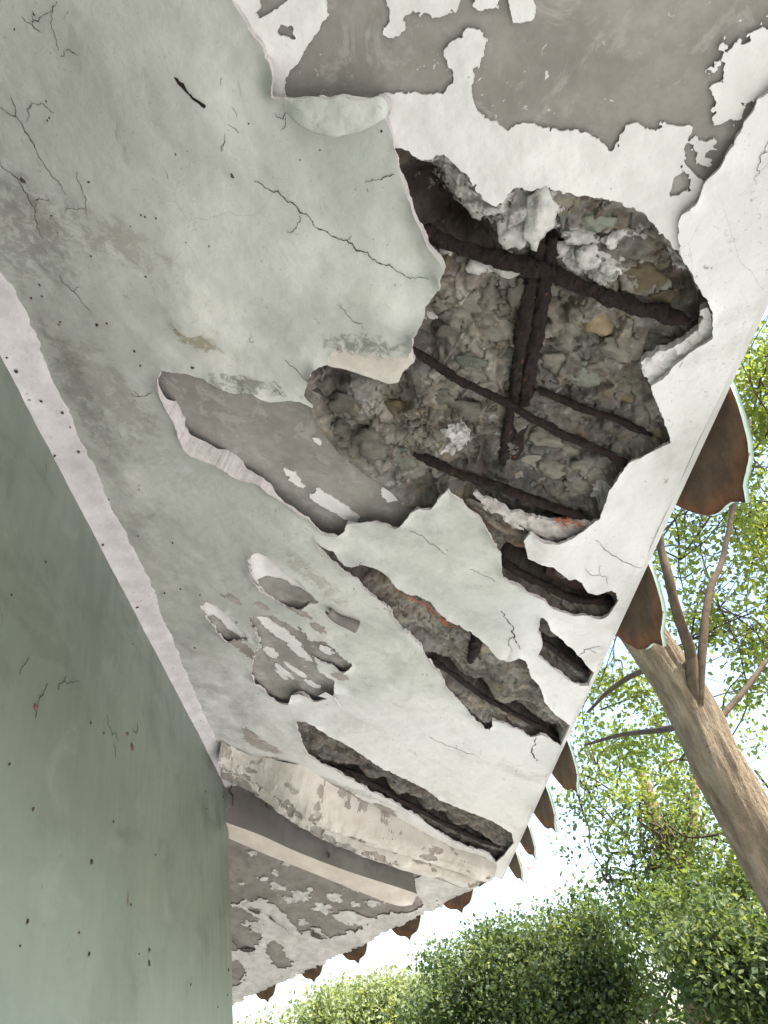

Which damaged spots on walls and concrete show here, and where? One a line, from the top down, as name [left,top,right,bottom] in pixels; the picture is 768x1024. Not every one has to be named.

crack [22,1,80,58]
crack [174,77,222,108]
crack [0,96,87,241]
crack [255,181,427,279]
spalling [158,0,768,616]
peeling [201,553,360,707]
spalling [319,545,569,745]
spalling [539,618,592,683]
peeling [241,726,288,763]
spalling [297,721,513,861]